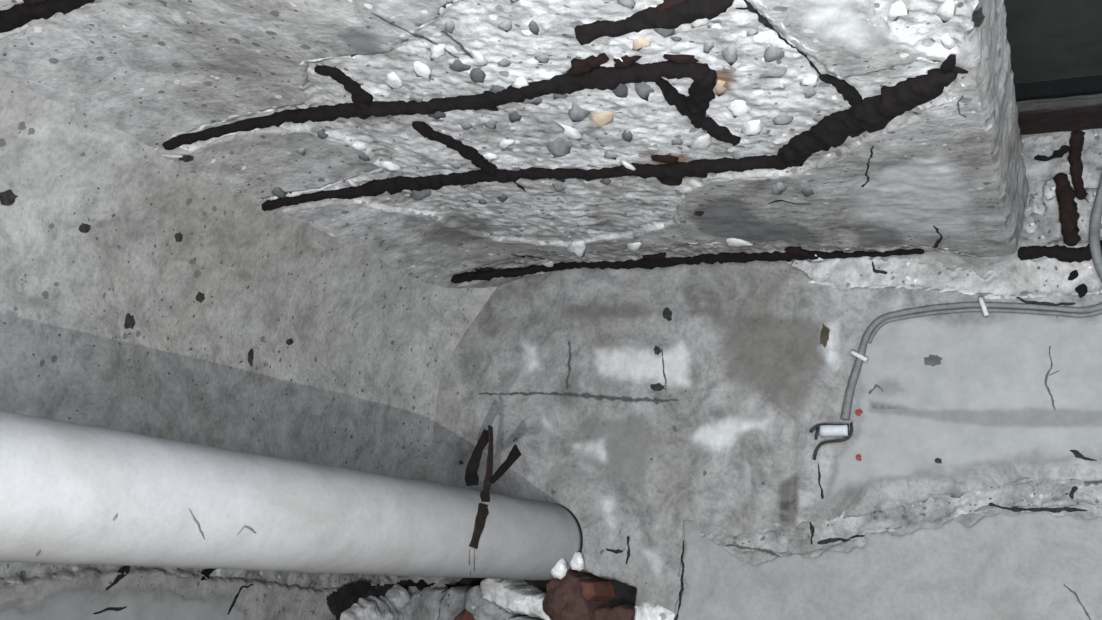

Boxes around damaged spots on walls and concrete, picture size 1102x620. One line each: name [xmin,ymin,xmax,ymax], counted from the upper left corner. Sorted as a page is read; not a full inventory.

rust [715,71,731,91]
spalling [155,0,1102,299]
crack [872,261,887,274]
crack [1016,270,1088,306]
peeling [595,342,691,391]
crack [1045,346,1060,410]
peeling [692,417,768,452]
peeling [827,313,1102,503]
crack [989,450,1102,513]
peeling [674,477,1102,620]
peeling [0,562,409,620]
crack [1063,584,1091,620]